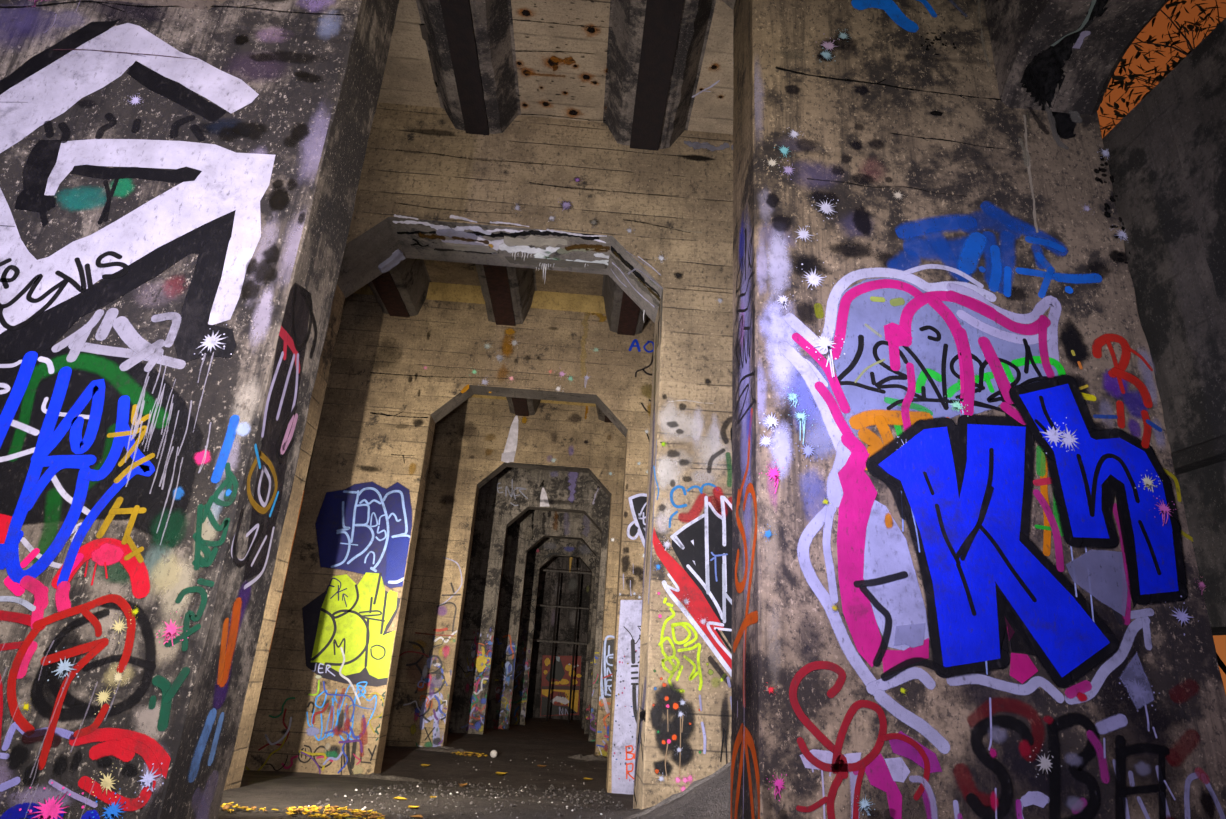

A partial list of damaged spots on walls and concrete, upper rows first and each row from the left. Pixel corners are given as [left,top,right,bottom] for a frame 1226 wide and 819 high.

rust [516,56,608,108]
spalling [378,249,405,273]